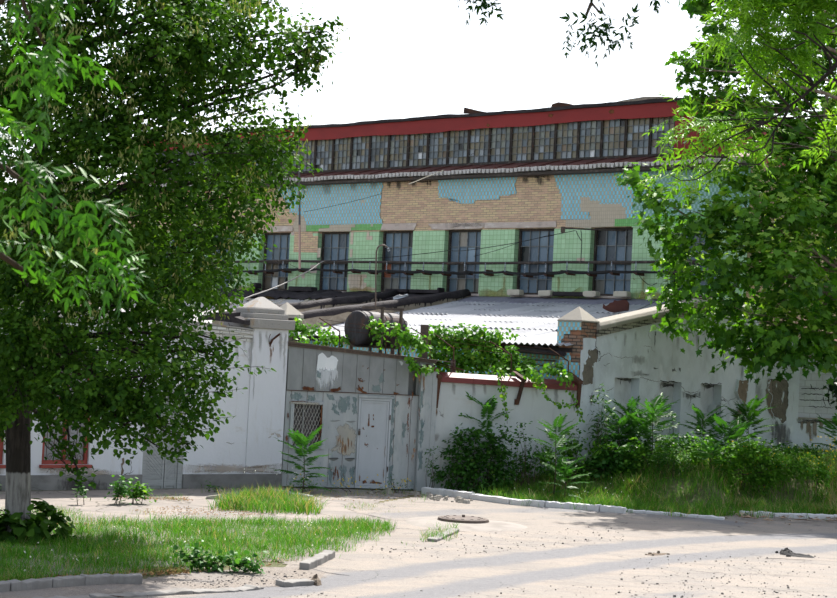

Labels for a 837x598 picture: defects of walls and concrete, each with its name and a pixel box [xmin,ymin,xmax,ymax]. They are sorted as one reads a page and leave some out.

spalling [566,197,626,228]
rust [603,300,630,313]
spalling [581,347,600,406]
spalling [735,379,749,418]
leakage [766,379,790,447]
spalling [768,377,789,424]
leakage [800,419,835,439]